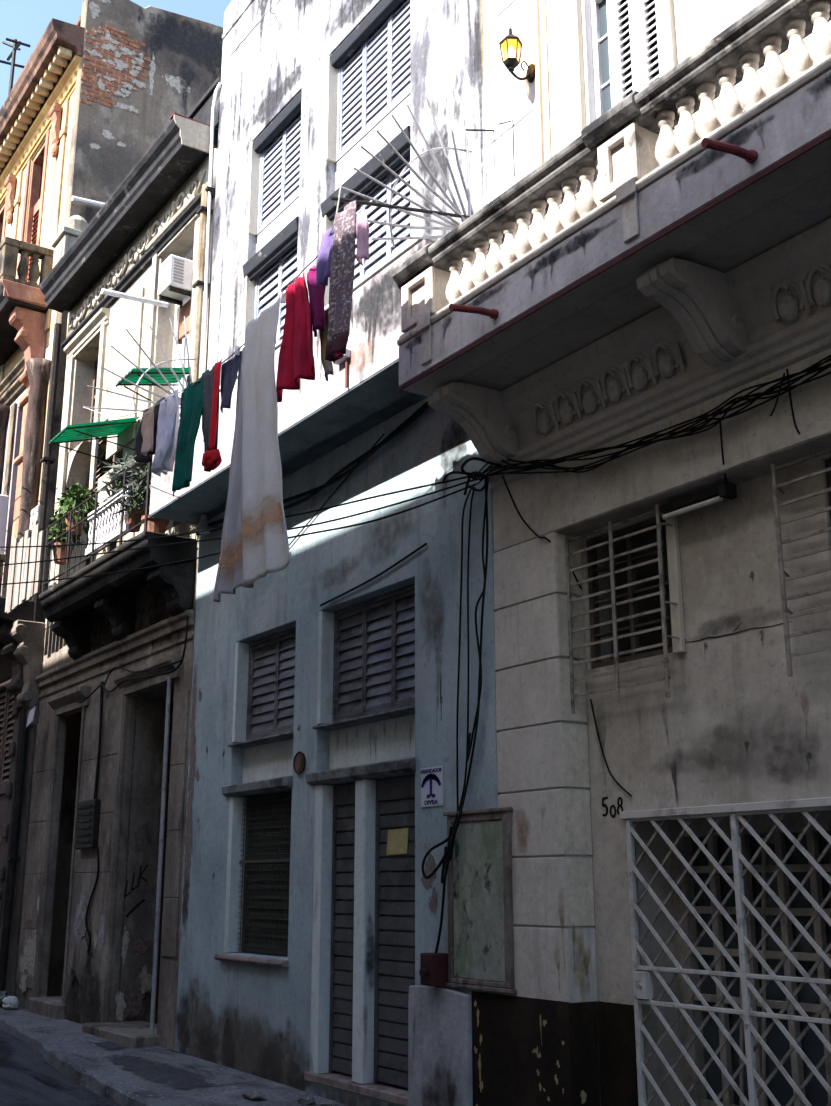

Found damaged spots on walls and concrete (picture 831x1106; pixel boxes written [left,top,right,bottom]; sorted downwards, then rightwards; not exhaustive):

spalling [80,2,191,114]
leakage [138,15,223,105]
leakage [227,58,301,197]
leakage [258,0,272,53]
leakage [329,0,372,30]
leakage [419,131,449,234]
leakage [454,0,483,177]
leakage [676,116,773,183]
leakage [177,981,309,1090]
peeling [474,999,483,1106]
peeling [532,1014,564,1101]